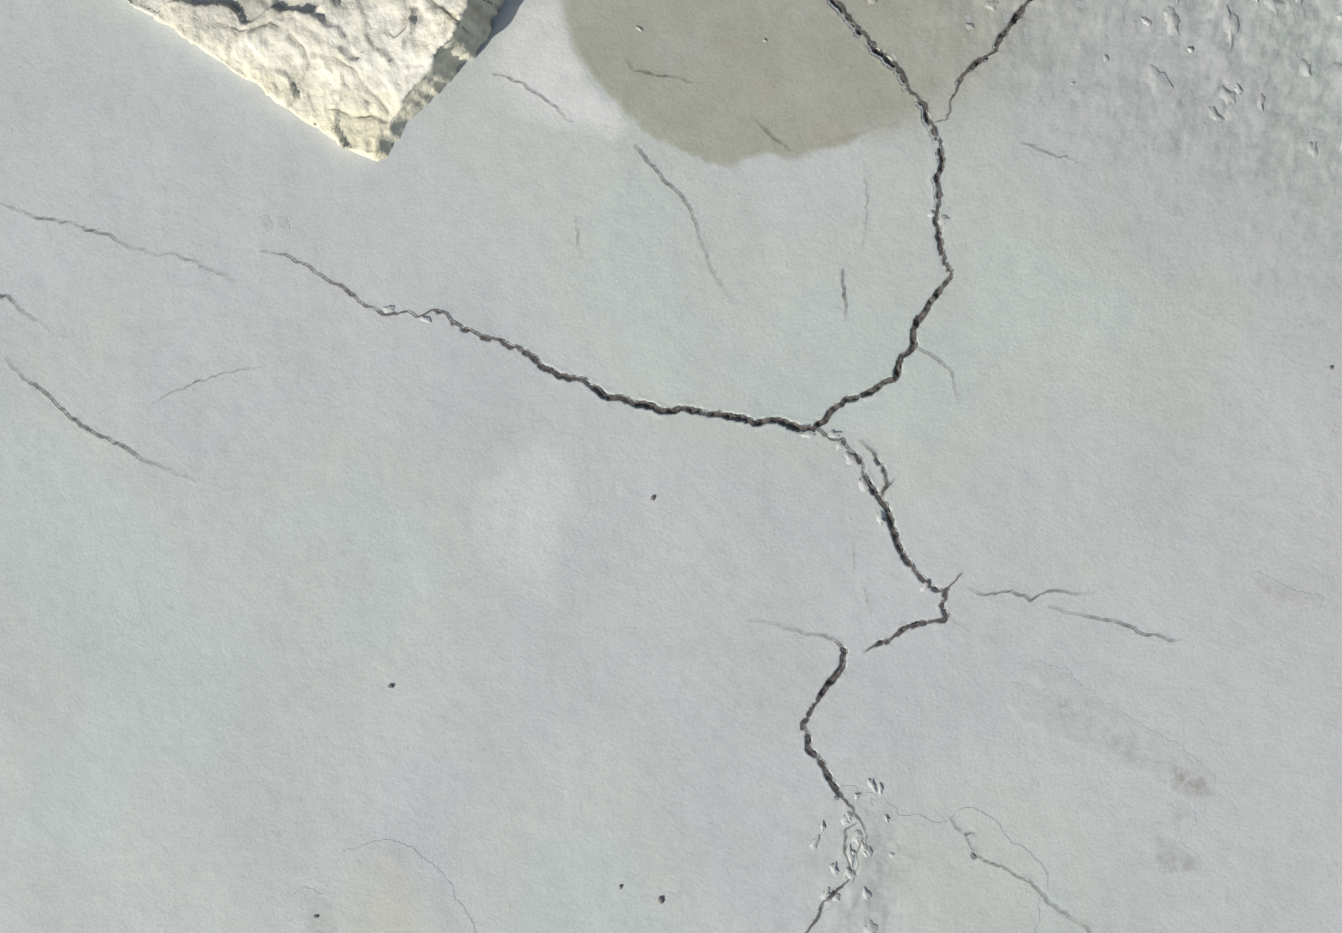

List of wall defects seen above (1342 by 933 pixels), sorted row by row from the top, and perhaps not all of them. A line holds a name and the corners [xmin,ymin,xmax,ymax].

damp [474,0,983,175]
crack [34,217,115,241]
crack [17,372,148,463]
crack [276,0,1170,933]